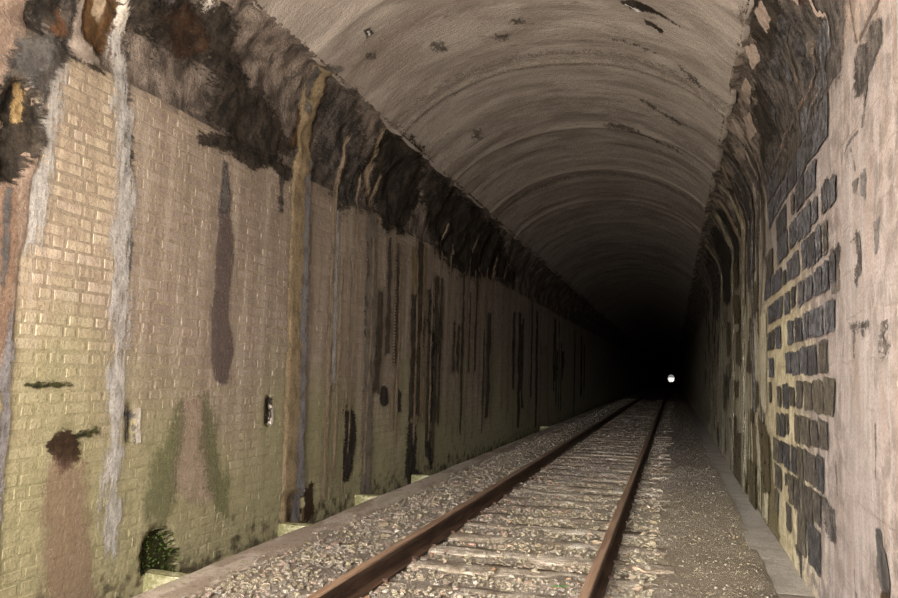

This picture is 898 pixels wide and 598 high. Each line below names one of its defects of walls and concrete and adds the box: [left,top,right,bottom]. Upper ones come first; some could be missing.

leakage [24,59,72,259]
rust [52,0,130,67]
leakage [201,62,294,163]
spalling [620,0,680,34]
peeling [853,17,883,128]
leakage [46,0,180,558]
leakage [211,161,234,384]
leakage [300,49,769,525]
peeling [703,0,841,578]
peeling [875,528,890,598]